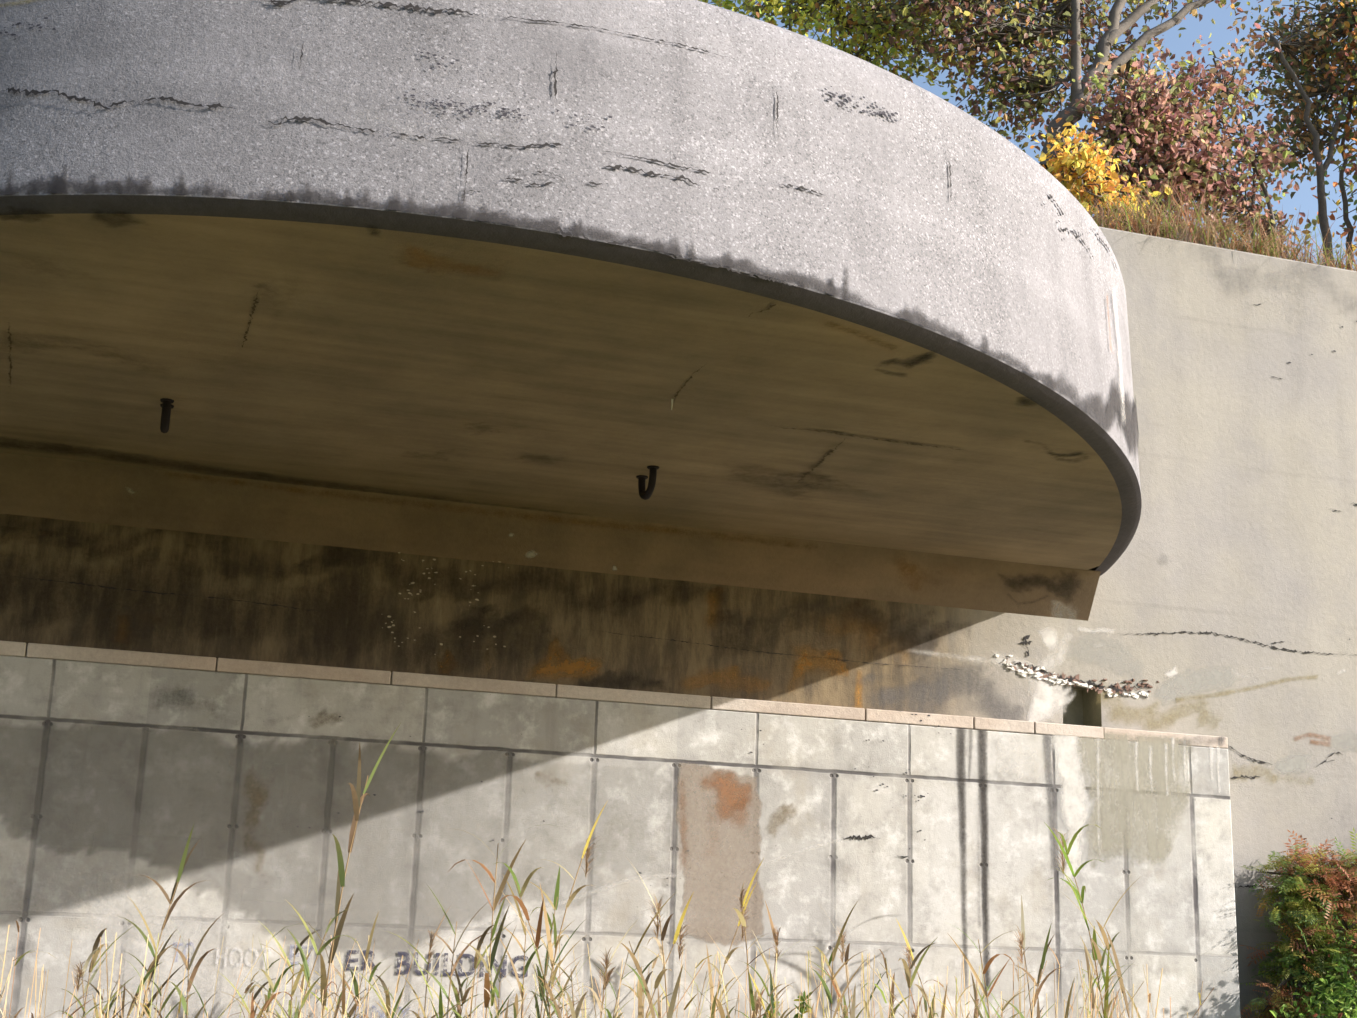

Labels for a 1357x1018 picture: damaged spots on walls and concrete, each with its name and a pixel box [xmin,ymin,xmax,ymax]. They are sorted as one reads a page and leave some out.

crack [261,0,295,8]
crack [328,0,732,100]
crack [1,87,724,203]
crack [778,184,823,195]
water stain [0,174,1139,454]
water stain [582,674,653,688]
spalling [995,654,1159,699]
crack [1118,631,1355,655]
water stain [998,631,1068,863]
corrosion [677,763,763,945]